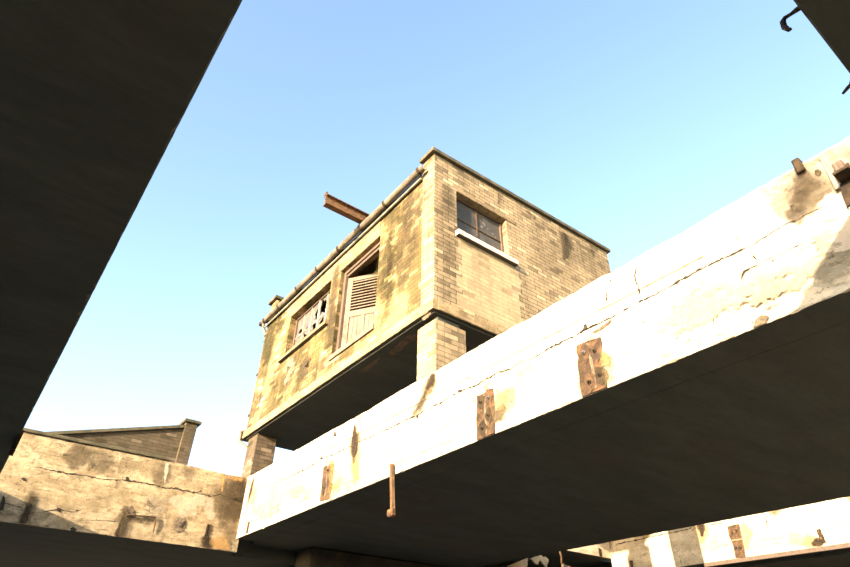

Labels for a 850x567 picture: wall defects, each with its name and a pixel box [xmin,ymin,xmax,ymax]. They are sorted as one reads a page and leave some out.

water stain [787,171,811,223]
crack [246,207,839,498]
water stain [416,373,435,411]
rust [477,386,515,438]
water stain [64,445,86,469]
crack [26,465,220,497]